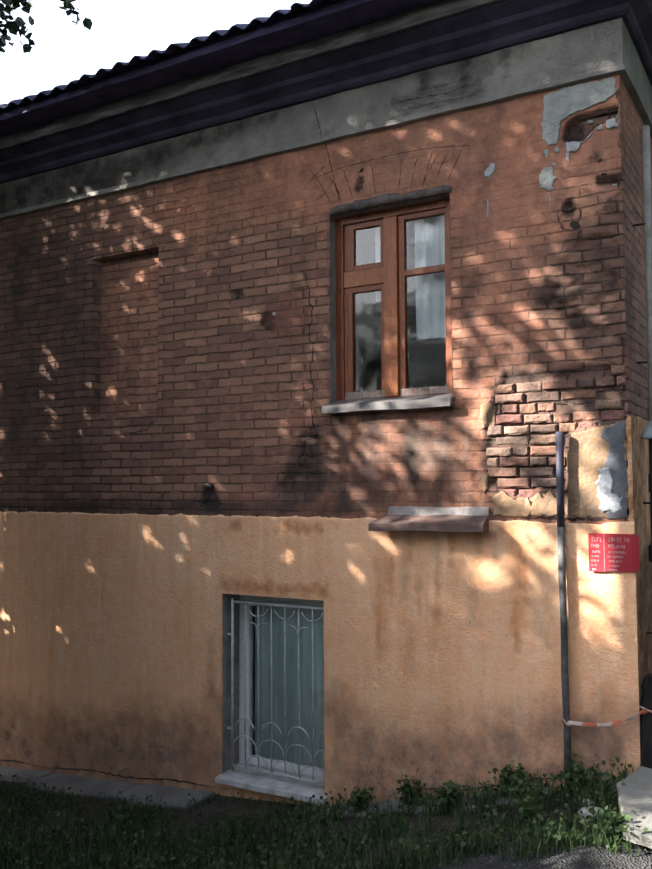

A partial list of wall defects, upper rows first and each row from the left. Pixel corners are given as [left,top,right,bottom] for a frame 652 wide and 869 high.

flaking render [539,77,618,202]
crack [292,277,324,468]
spalling [480,361,629,519]
water stain [0,711,204,786]
crack [1,760,210,787]